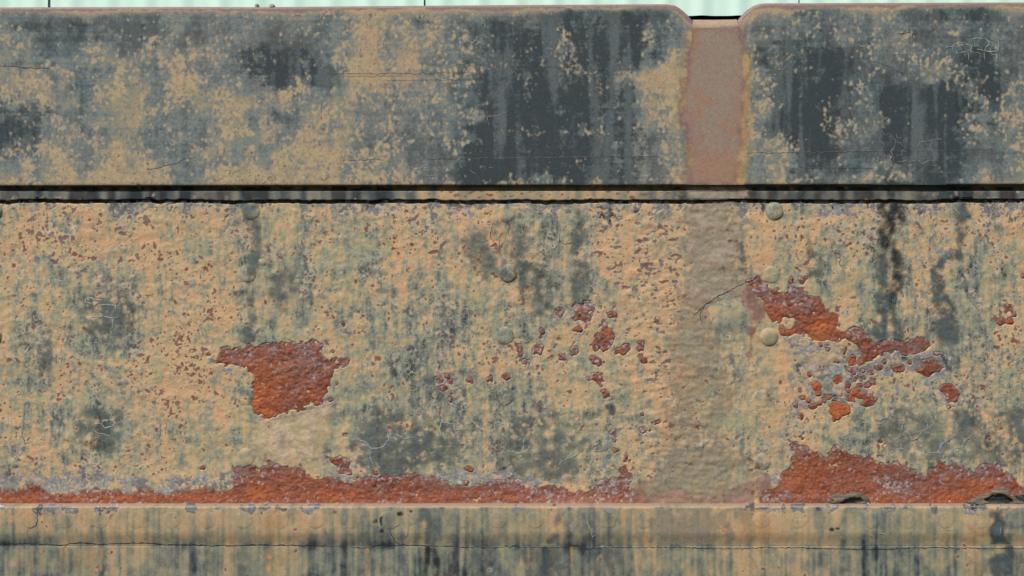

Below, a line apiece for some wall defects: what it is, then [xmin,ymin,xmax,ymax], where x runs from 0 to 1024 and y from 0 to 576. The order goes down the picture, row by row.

crack [693,276,761,323]
leakage [873,201,905,341]
corrosion [0,276,1024,503]
leakage [419,509,440,576]
leakage [989,512,1014,576]